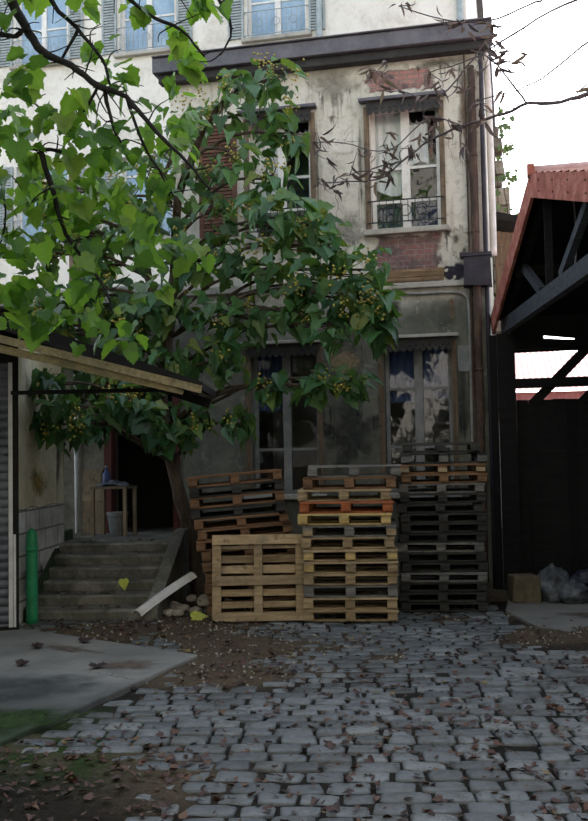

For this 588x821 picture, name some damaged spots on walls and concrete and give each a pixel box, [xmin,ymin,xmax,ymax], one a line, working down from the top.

flaking render [362,63,434,93]
flaking render [372,225,468,279]